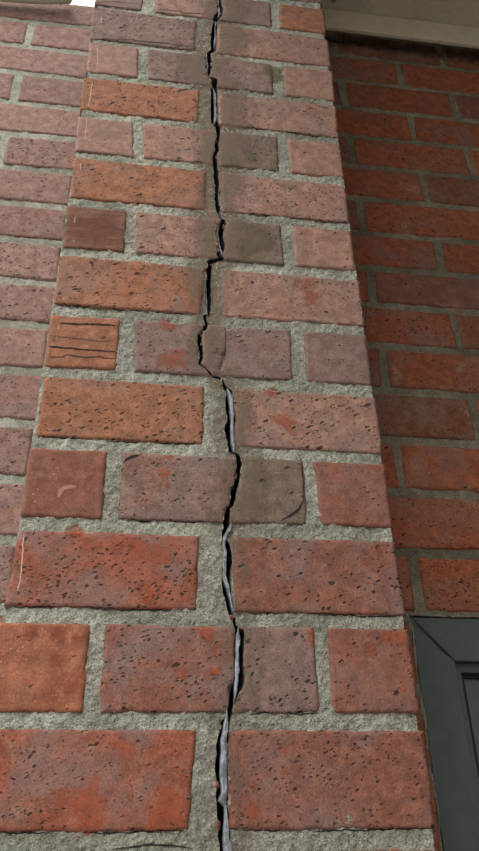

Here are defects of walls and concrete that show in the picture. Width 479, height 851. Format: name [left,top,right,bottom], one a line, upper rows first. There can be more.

crack [290,216,347,224]
crack [84,0,316,851]
crack [14,603,55,611]
crack [306,612,453,659]
crack [0,828,53,836]
crack [315,825,432,833]